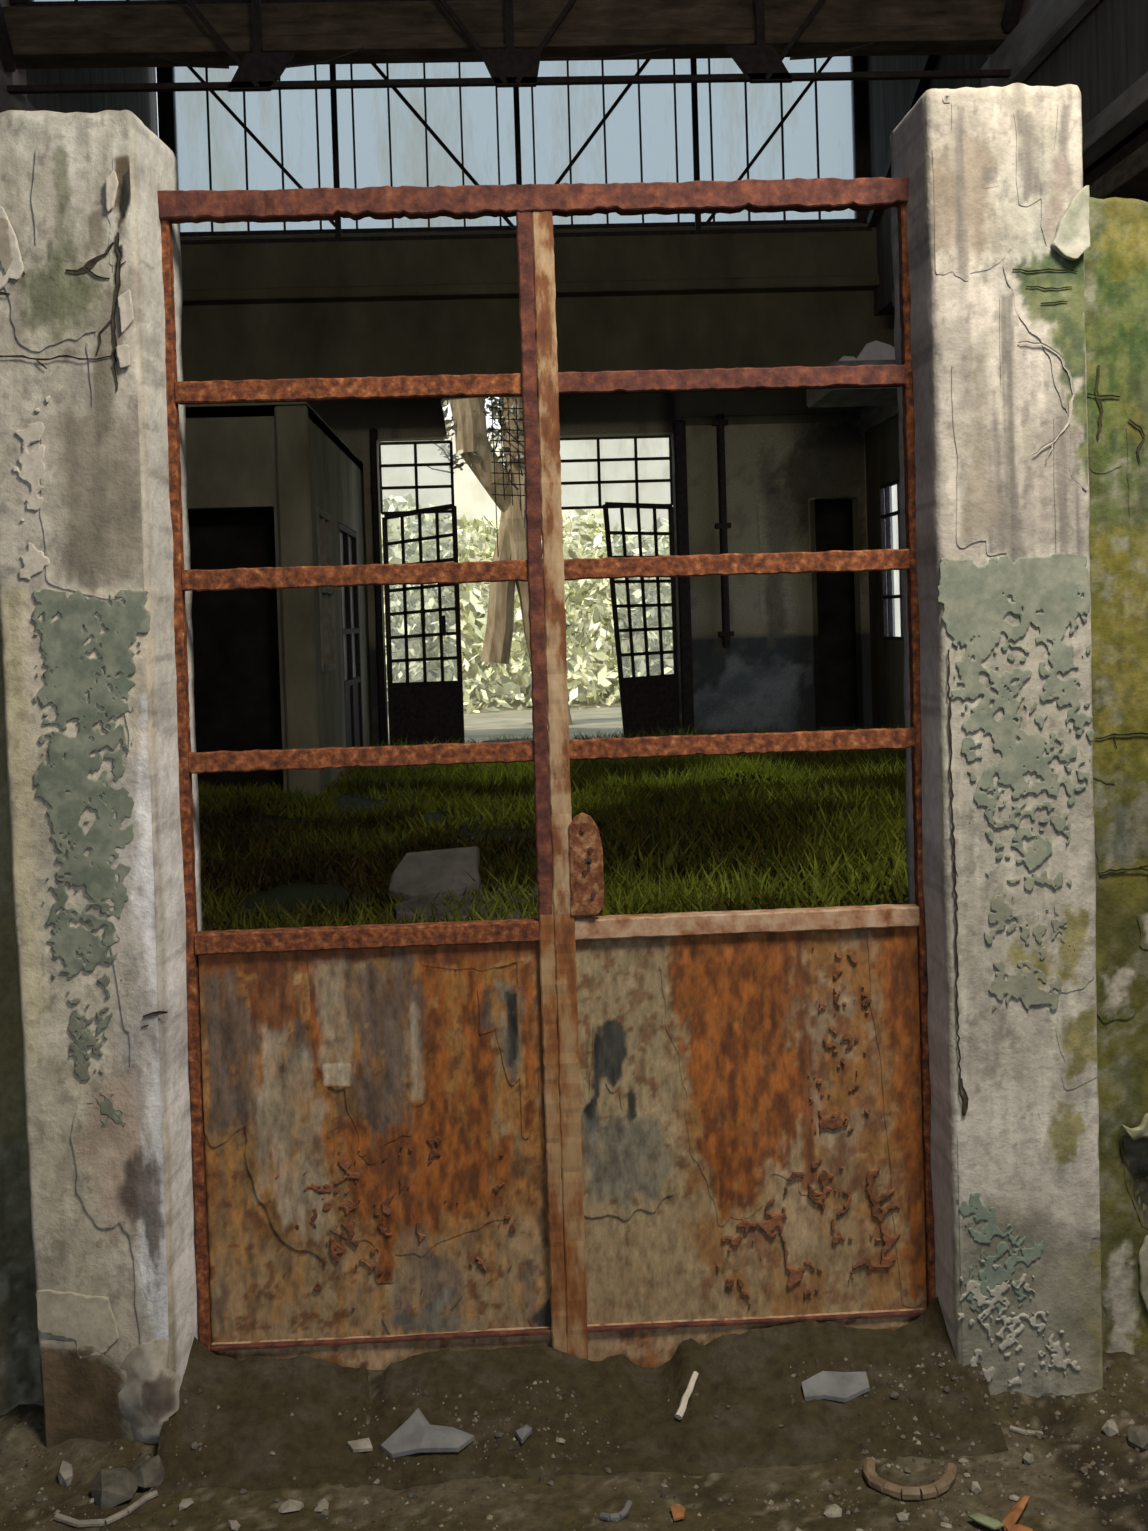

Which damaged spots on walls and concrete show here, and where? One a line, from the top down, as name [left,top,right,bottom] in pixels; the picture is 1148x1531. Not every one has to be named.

peeling [0,206,24,290]
crack [0,232,126,392]
spalling [1041,151,1090,261]
water stain [1122,362,1148,530]
peeling [19,542,151,1135]
peeling [937,552,1094,1011]
water stain [1093,781,1148,877]
water stain [1096,959,1140,1023]
water stain [1137,912,1148,949]
rust [295,941,546,1297]
rust [660,927,926,1308]
peeling [1101,1113,1148,1355]